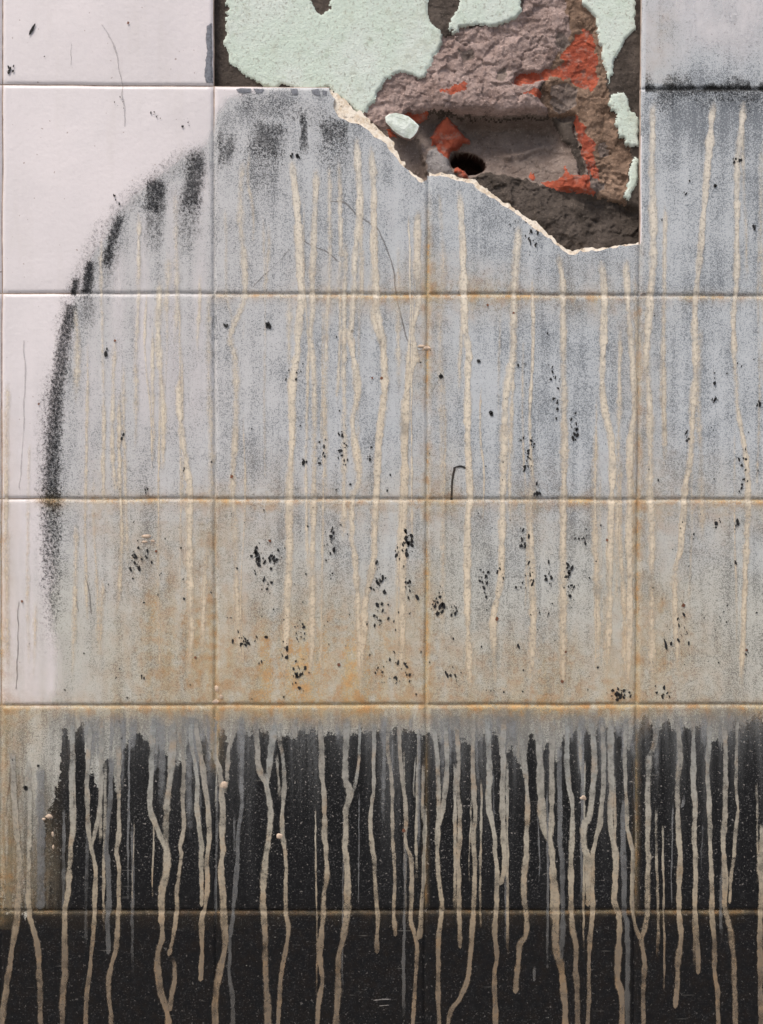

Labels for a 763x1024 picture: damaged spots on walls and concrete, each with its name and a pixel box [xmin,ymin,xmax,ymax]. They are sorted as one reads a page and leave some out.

spalling [204,0,640,255]
rust [254,636,327,708]
rust [468,703,646,713]
damp [521,826,529,905]
damp [447,823,477,1024]
damp [513,906,529,994]
damp [550,881,562,962]
damp [559,964,569,1024]